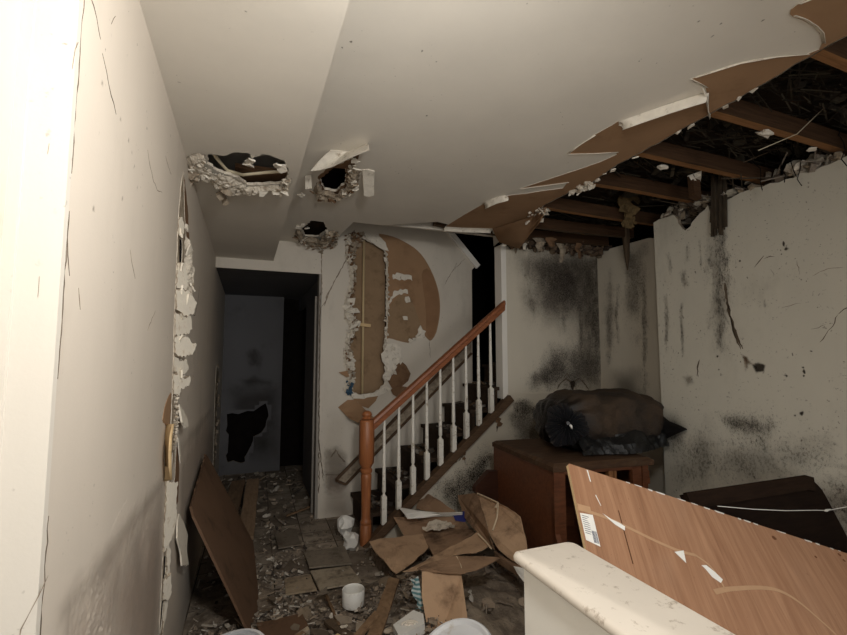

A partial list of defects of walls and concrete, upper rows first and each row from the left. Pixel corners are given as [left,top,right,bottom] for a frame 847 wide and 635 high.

crack [71,0,116,173]
peeling [444,0,847,233]
crack [57,211,70,379]
flaking render [159,144,374,635]
spalling [292,221,411,423]
water stain [534,257,617,390]
water stain [708,236,743,349]
crack [20,516,49,635]